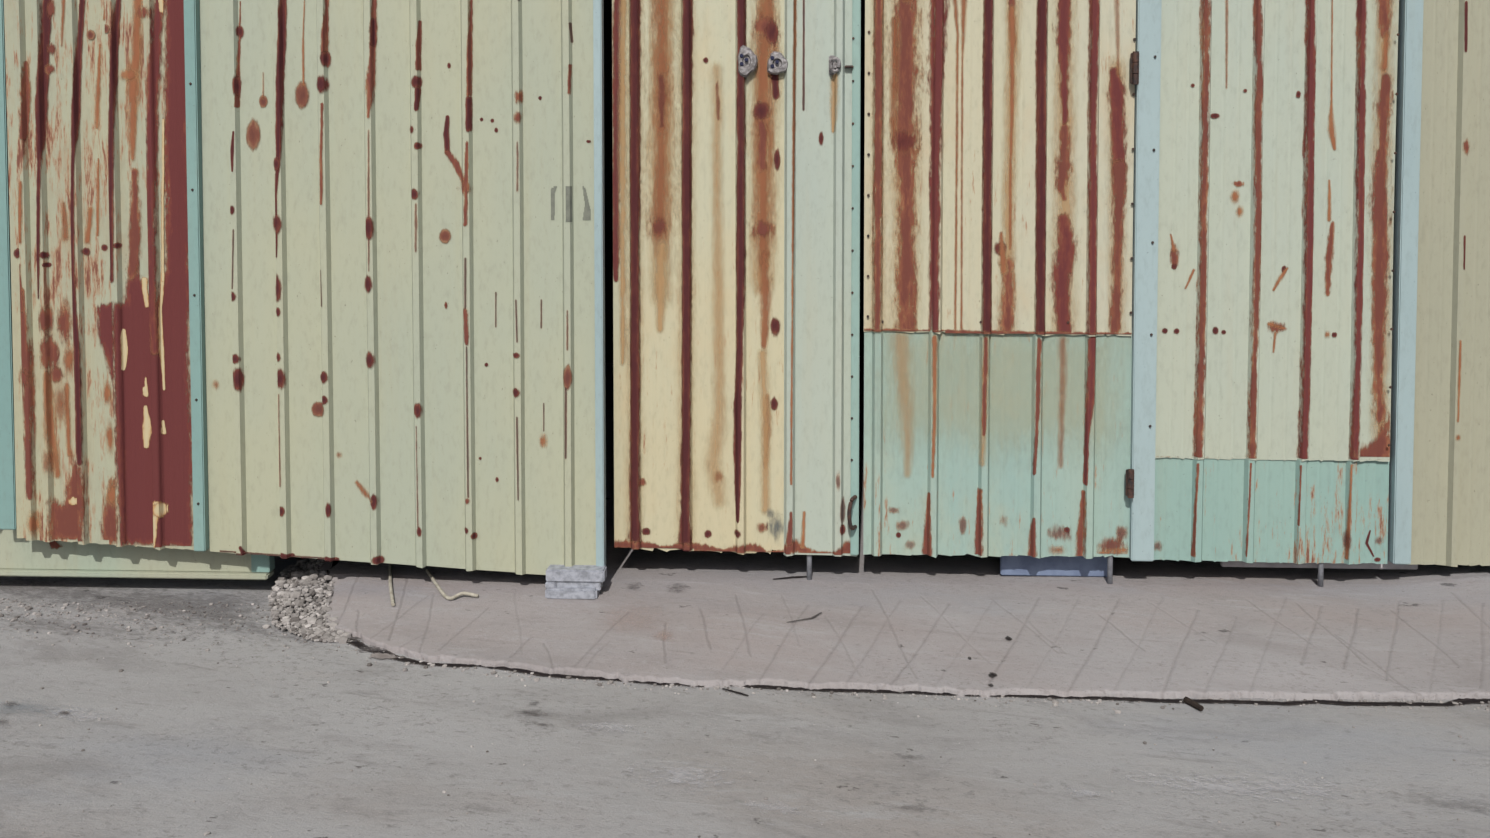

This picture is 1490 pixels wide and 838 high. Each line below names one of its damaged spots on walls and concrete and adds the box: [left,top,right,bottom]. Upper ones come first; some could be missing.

rust [14,0,193,549]
rust [214,354,244,391]
rust [230,0,331,257]
rust [312,371,328,417]
rust [365,0,377,292]
rust [410,20,422,149]
rust [444,258,481,504]
rust [439,0,498,243]
rust [563,310,572,459]
rust [612,0,850,555]
rust [864,0,1132,557]
rust [1162,0,1393,562]